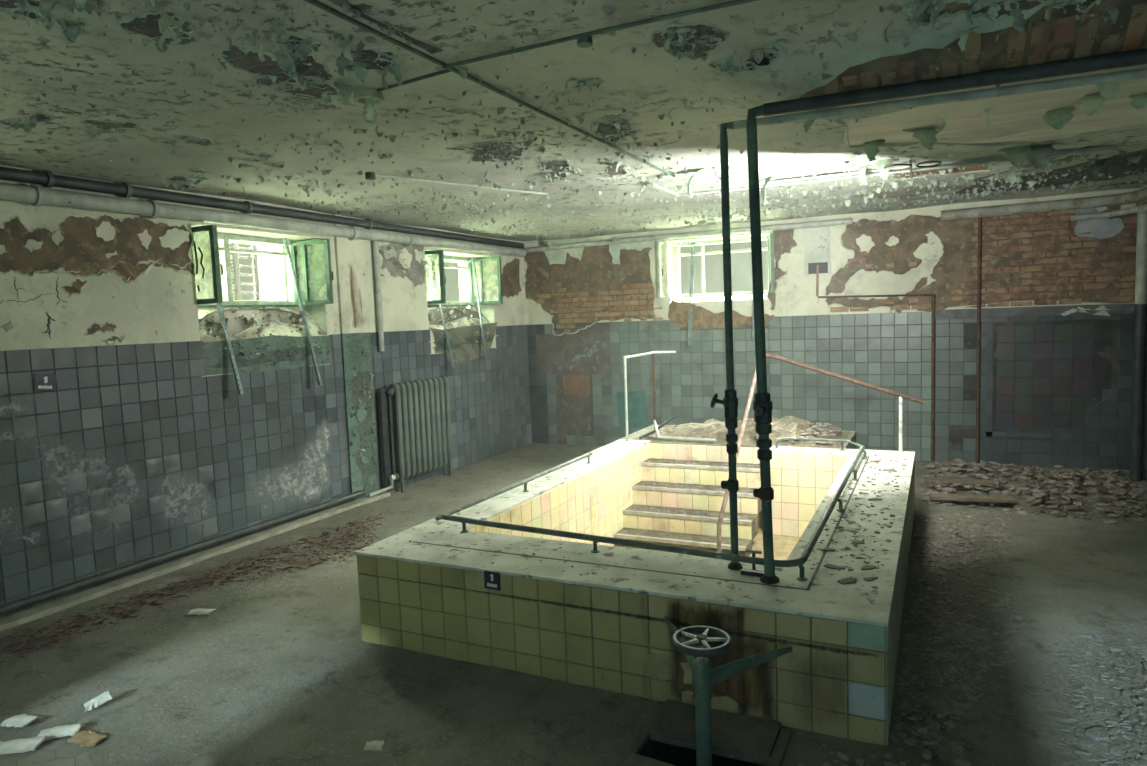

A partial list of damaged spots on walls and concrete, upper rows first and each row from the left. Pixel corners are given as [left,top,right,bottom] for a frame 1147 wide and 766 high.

flaking render [0,0,1147,441]
damp [254,421,329,508]